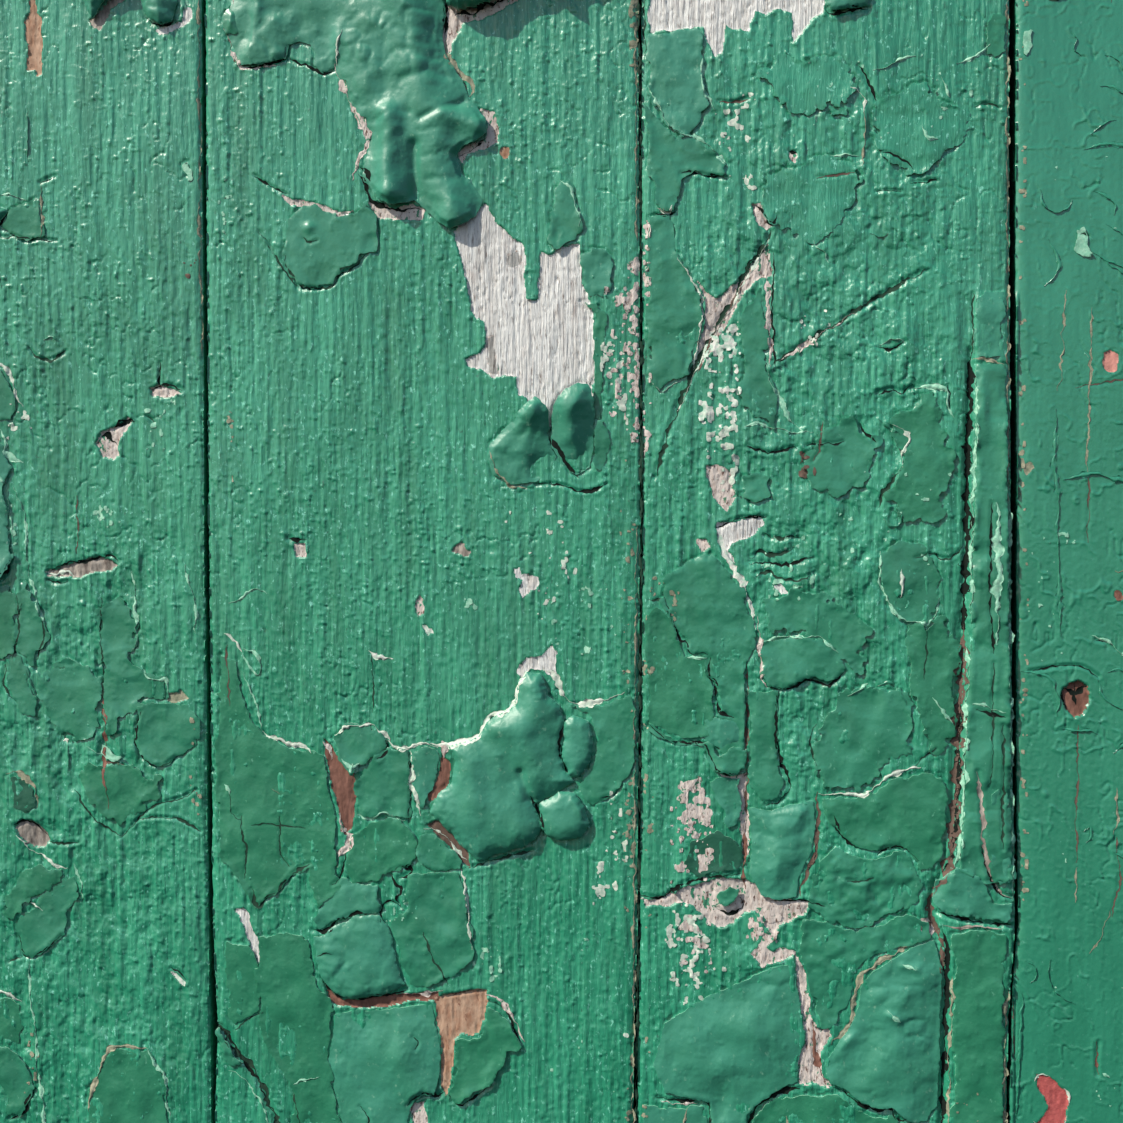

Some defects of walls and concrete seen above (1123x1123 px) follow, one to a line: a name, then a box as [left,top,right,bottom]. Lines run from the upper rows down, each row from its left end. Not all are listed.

peeling [646,0,869,138]
peeling [752,151,863,244]
peeling [454,180,614,470]
peeling [645,214,777,431]
crack [102,417,154,446]
crack [50,500,118,584]
crack [315,864,413,1000]
peeling [214,656,522,1123]
peeling [571,464,1017,1123]
crack [641,293,1011,1123]
crack [1033,665,1096,862]
crack [216,1012,300,1123]